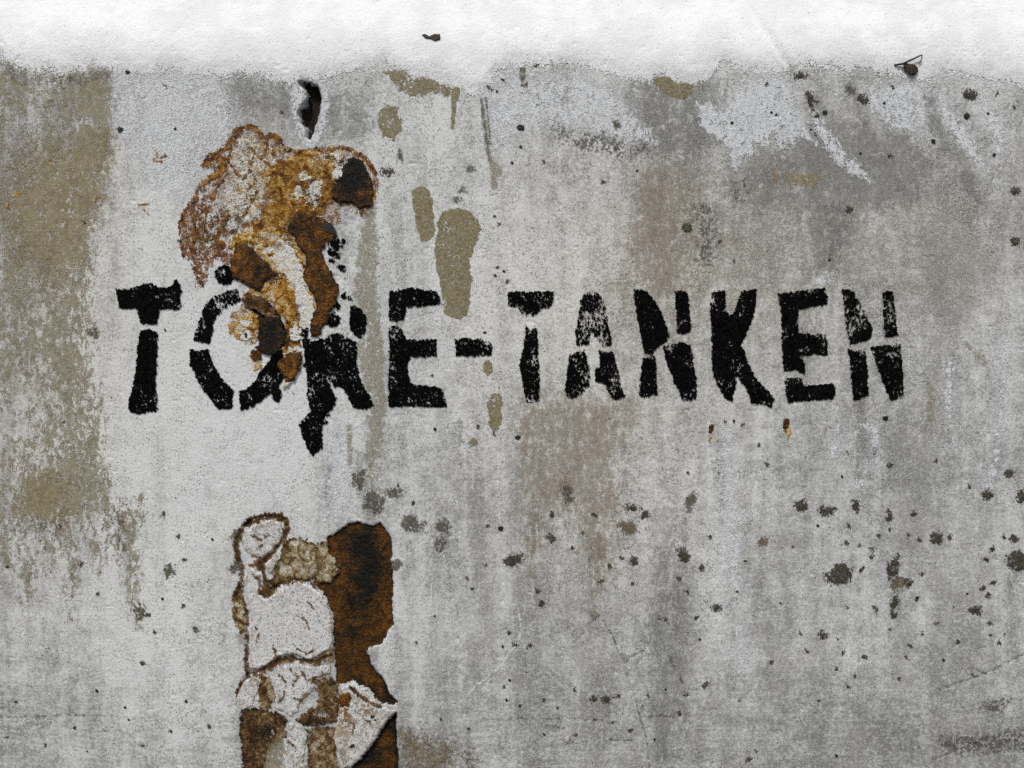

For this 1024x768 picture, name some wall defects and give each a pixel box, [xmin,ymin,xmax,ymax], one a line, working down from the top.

leakage [377,104,402,141]
leakage [382,69,460,129]
rust [177,123,380,388]
leakage [412,186,482,319]
leakage [0,61,246,630]